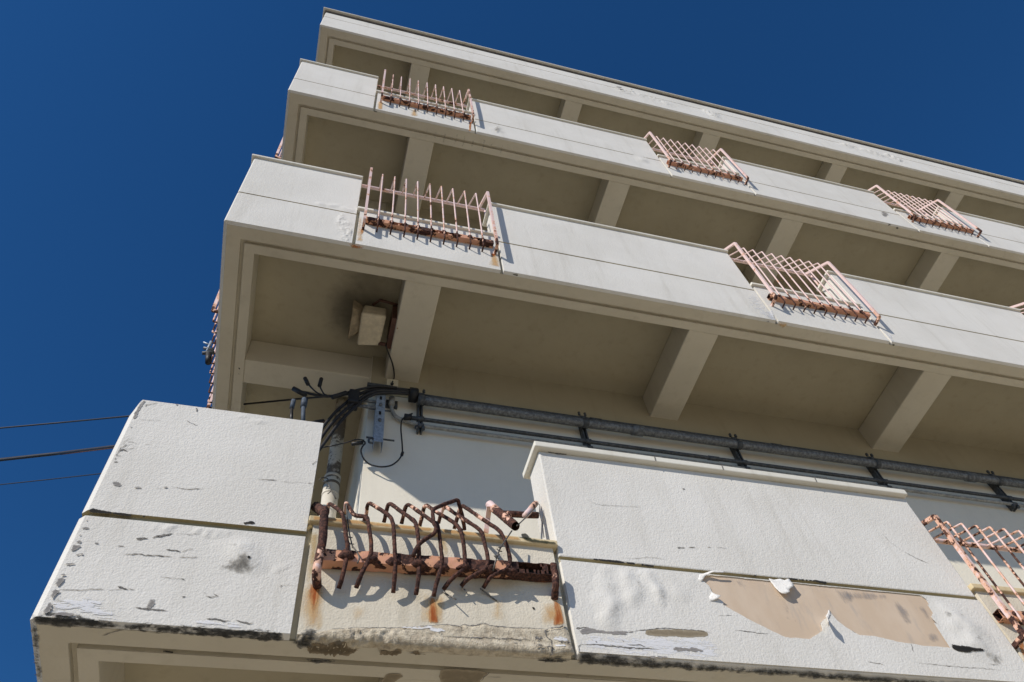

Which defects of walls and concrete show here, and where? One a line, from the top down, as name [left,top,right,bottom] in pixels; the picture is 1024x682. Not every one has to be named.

peeling [43,527,114,618]
rust [306,585,321,623]
rust [427,598,442,623]
rust [547,601,563,625]
peeling [698,570,985,653]
spalling [297,624,718,659]